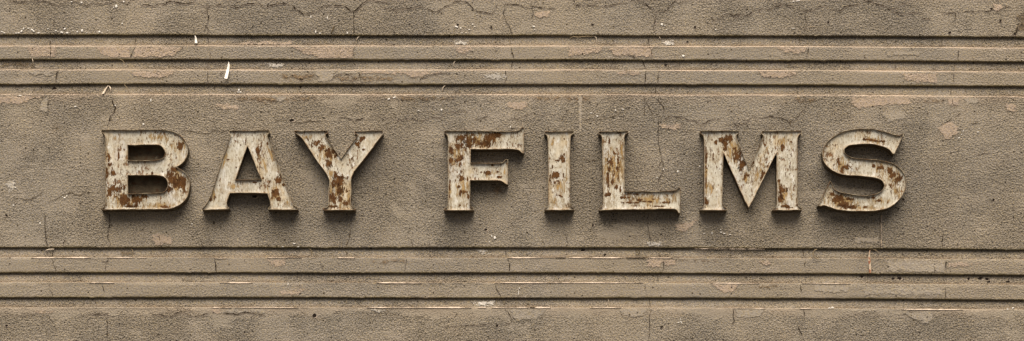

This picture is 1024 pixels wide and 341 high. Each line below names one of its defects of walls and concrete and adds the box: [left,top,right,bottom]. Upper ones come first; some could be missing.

crack [711,0,1022,54]
crack [10,0,807,184]
rust [106,135,188,209]
rust [240,134,290,207]
rust [302,135,351,209]
rust [449,132,502,206]
rust [549,135,568,207]
rust [603,138,676,207]
rust [705,134,793,208]
rust [777,179,797,209]
rust [834,157,850,174]
rust [821,163,903,210]